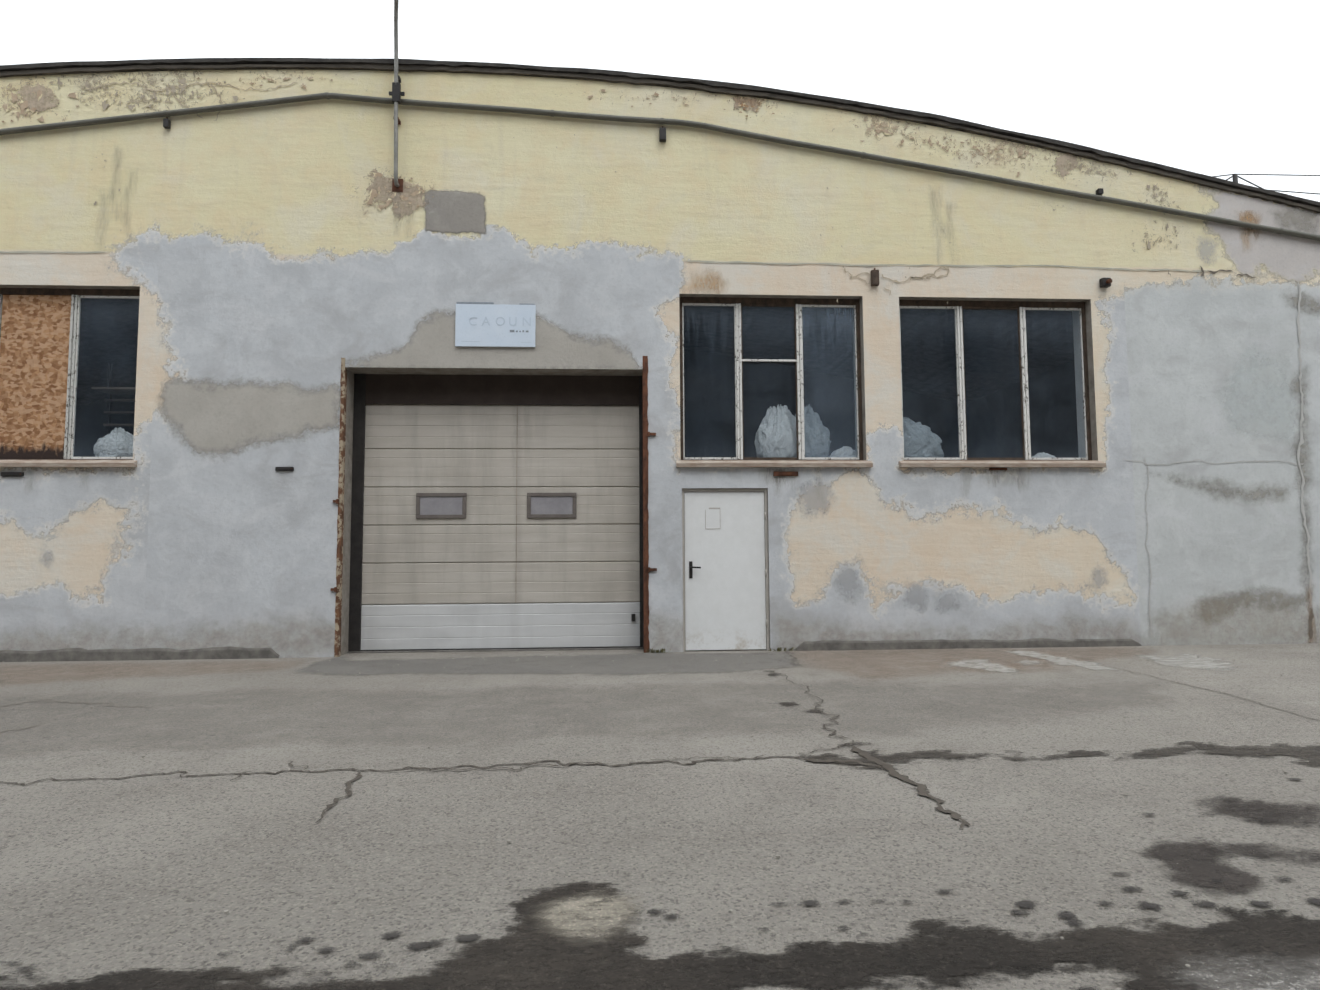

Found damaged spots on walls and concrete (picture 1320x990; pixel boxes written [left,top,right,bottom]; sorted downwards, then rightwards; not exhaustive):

peeling [0,69,353,131]
peeling [832,112,1133,211]
flaking render [350,167,436,221]
crack [844,266,949,294]
crack [1168,266,1256,278]
flaking render [0,176,1320,658]
crack [1124,457,1303,637]